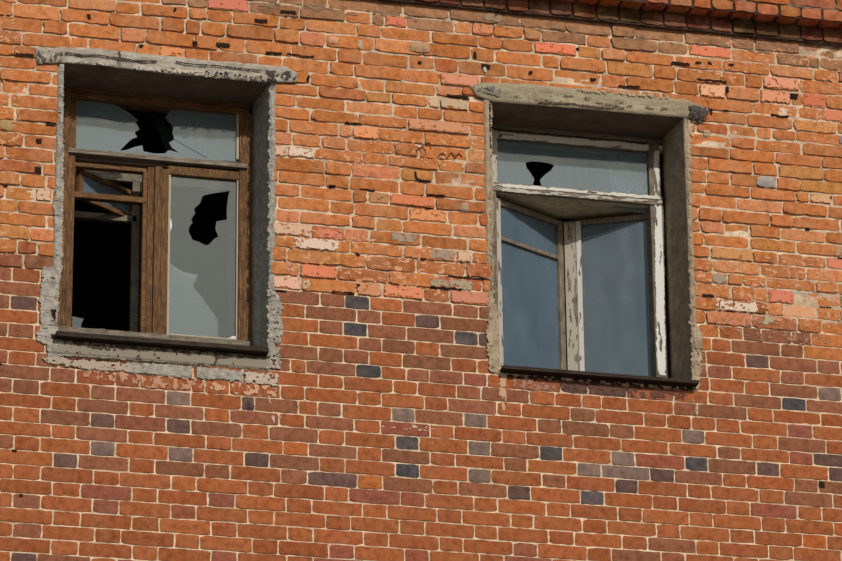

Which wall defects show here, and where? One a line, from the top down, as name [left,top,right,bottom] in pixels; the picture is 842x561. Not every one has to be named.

spalling [352,126,379,140]
spalling [275,145,315,159]
spalling [369,192,446,222]
spalling [274,223,310,237]
spalling [458,251,471,263]
peeling [491,130,666,375]
spalling [274,264,337,290]
spalling [356,283,423,299]
spalling [450,284,496,304]
spalling [768,289,815,318]